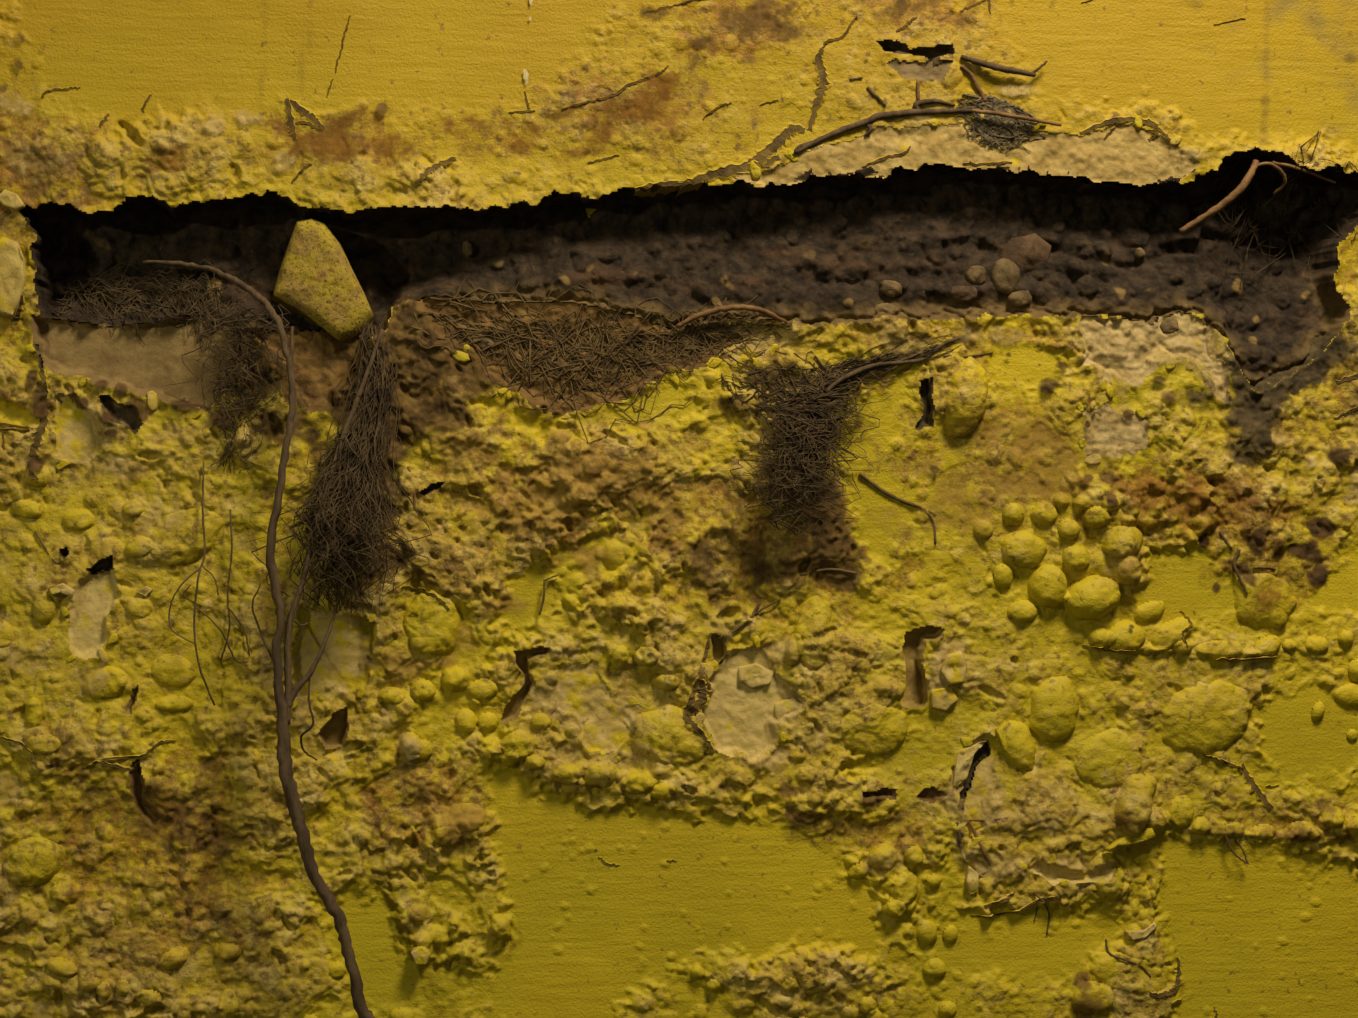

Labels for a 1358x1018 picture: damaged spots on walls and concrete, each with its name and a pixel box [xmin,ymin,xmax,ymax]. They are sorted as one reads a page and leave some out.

corrosion [720,0,798,41]
corrosion [569,71,679,157]
spalling [0,85,1358,481]
spalling [696,621,823,768]